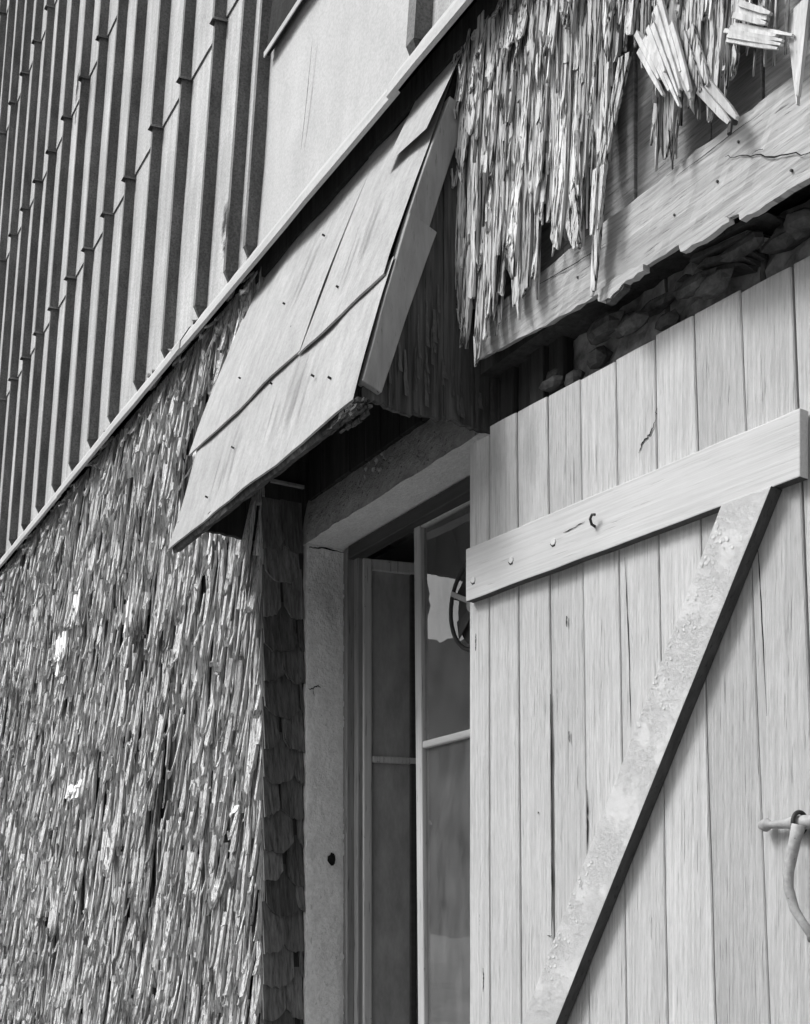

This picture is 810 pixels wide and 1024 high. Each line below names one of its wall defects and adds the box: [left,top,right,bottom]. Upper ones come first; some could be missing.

crack [677,116,810,176]